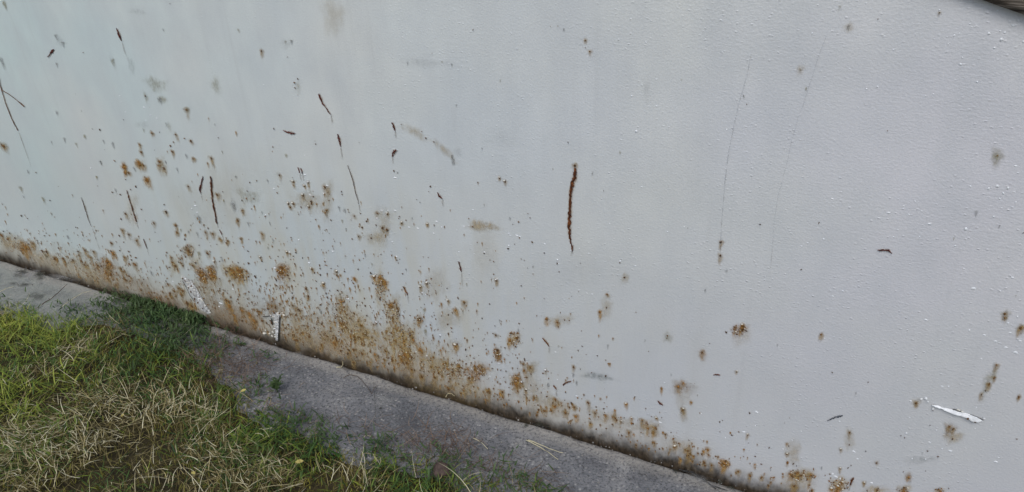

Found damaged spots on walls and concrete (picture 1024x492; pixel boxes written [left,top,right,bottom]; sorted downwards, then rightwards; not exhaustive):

corrosion [0,144,879,492]
peeling [920,397,985,423]